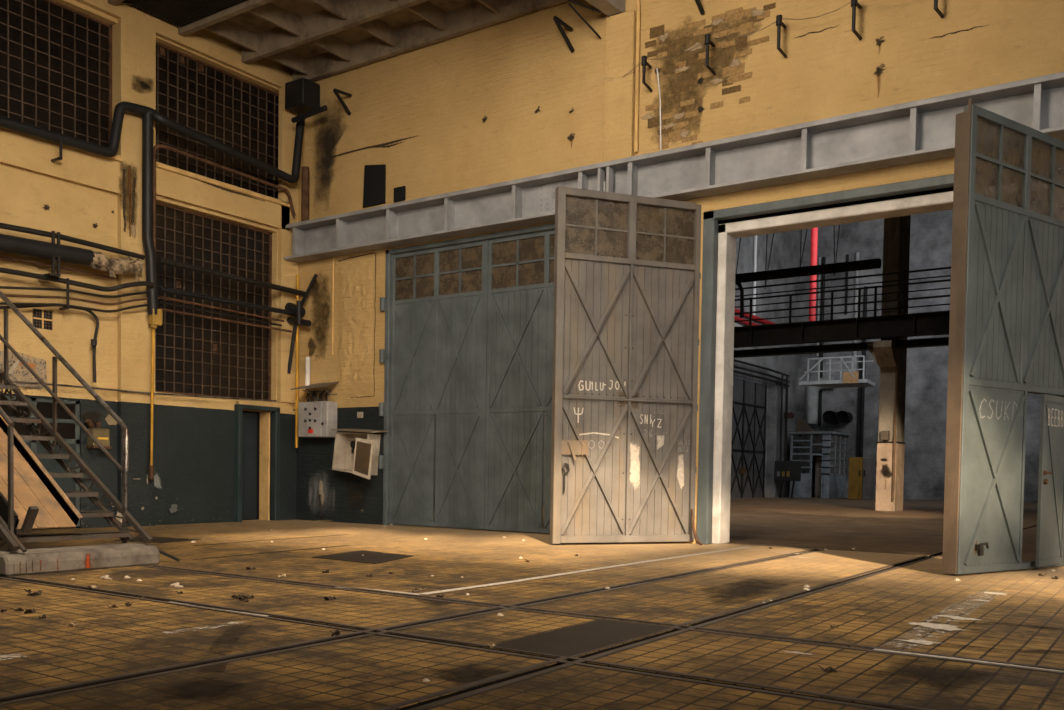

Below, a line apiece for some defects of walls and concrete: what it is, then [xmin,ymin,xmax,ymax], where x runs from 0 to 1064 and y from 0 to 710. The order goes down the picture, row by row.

flaking render [642,2,776,149]
crack [929,25,988,39]